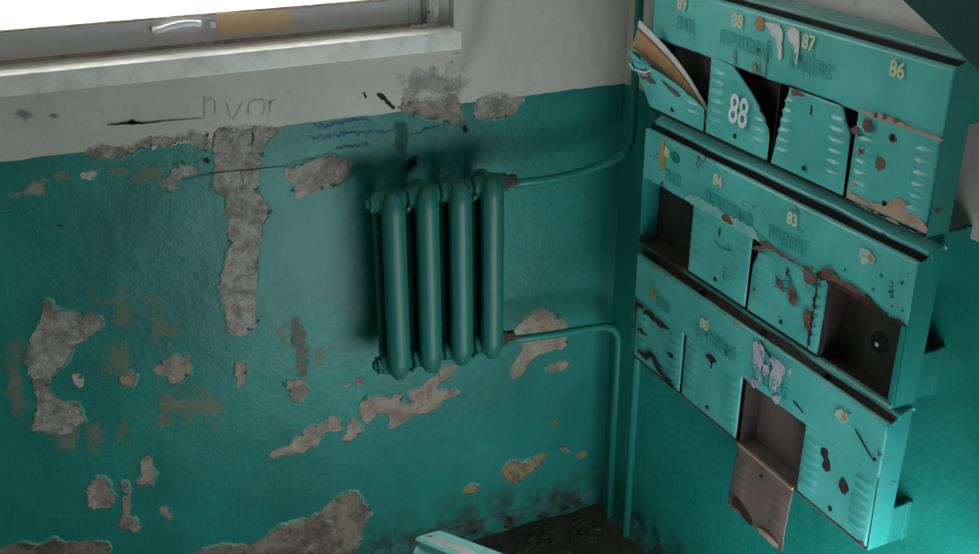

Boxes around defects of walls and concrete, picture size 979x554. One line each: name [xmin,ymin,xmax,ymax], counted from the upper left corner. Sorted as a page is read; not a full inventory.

peeling [363,92,525,127]
peeling [283,151,354,199]
peeling [9,125,279,337]
peeling [3,285,225,455]
peeling [509,306,571,381]
peeling [269,363,461,463]
peeling [499,453,548,484]
peeling [560,446,586,459]
peeling [0,535,113,554]
peeling [189,489,373,554]